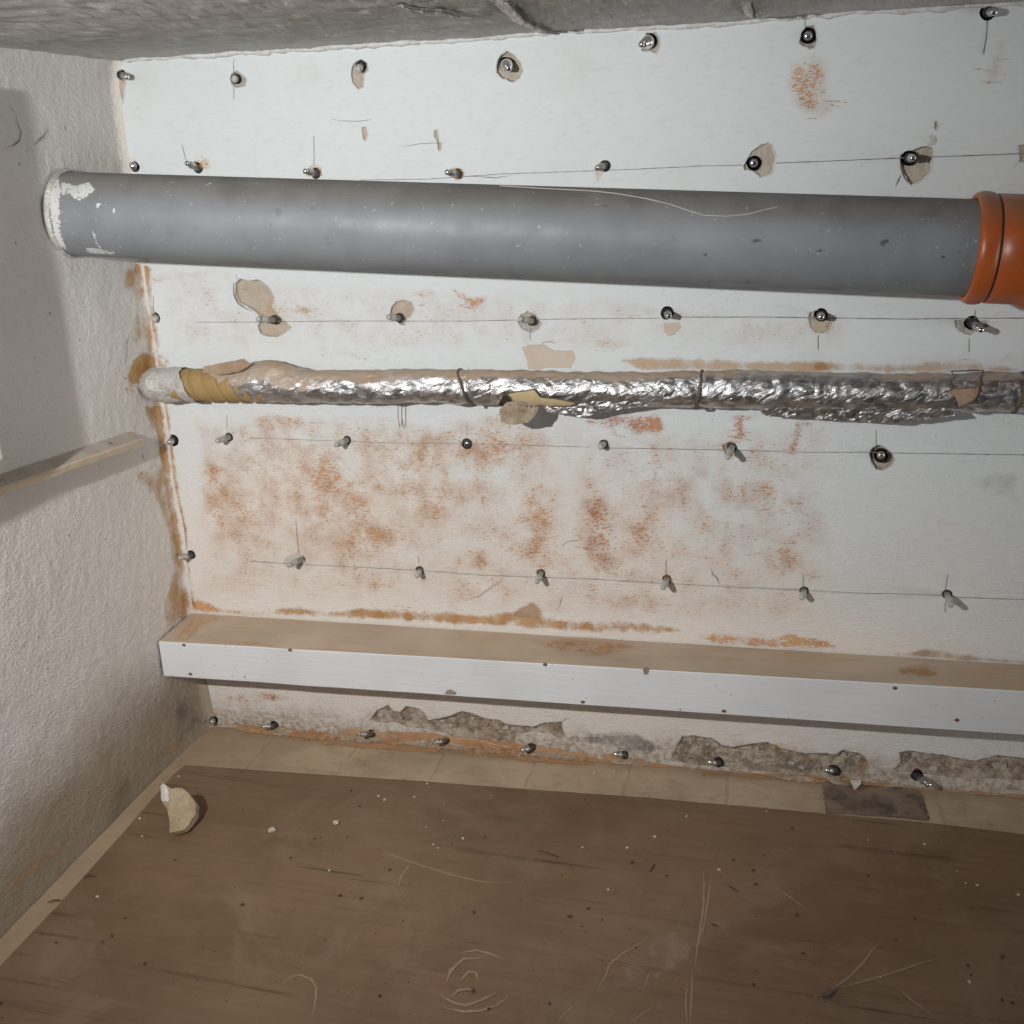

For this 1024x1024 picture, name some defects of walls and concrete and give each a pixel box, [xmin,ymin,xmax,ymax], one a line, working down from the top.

rust [790,63,847,119]
flaking render [234,278,291,338]
rust [129,313,168,391]
rust [146,403,187,569]
rust [204,414,561,601]
rust [577,415,819,613]
rust [336,607,415,620]
rust [434,613,630,655]
rust [707,634,835,648]
spalling [370,705,580,747]
spalling [672,735,869,790]
spalling [891,750,1024,782]